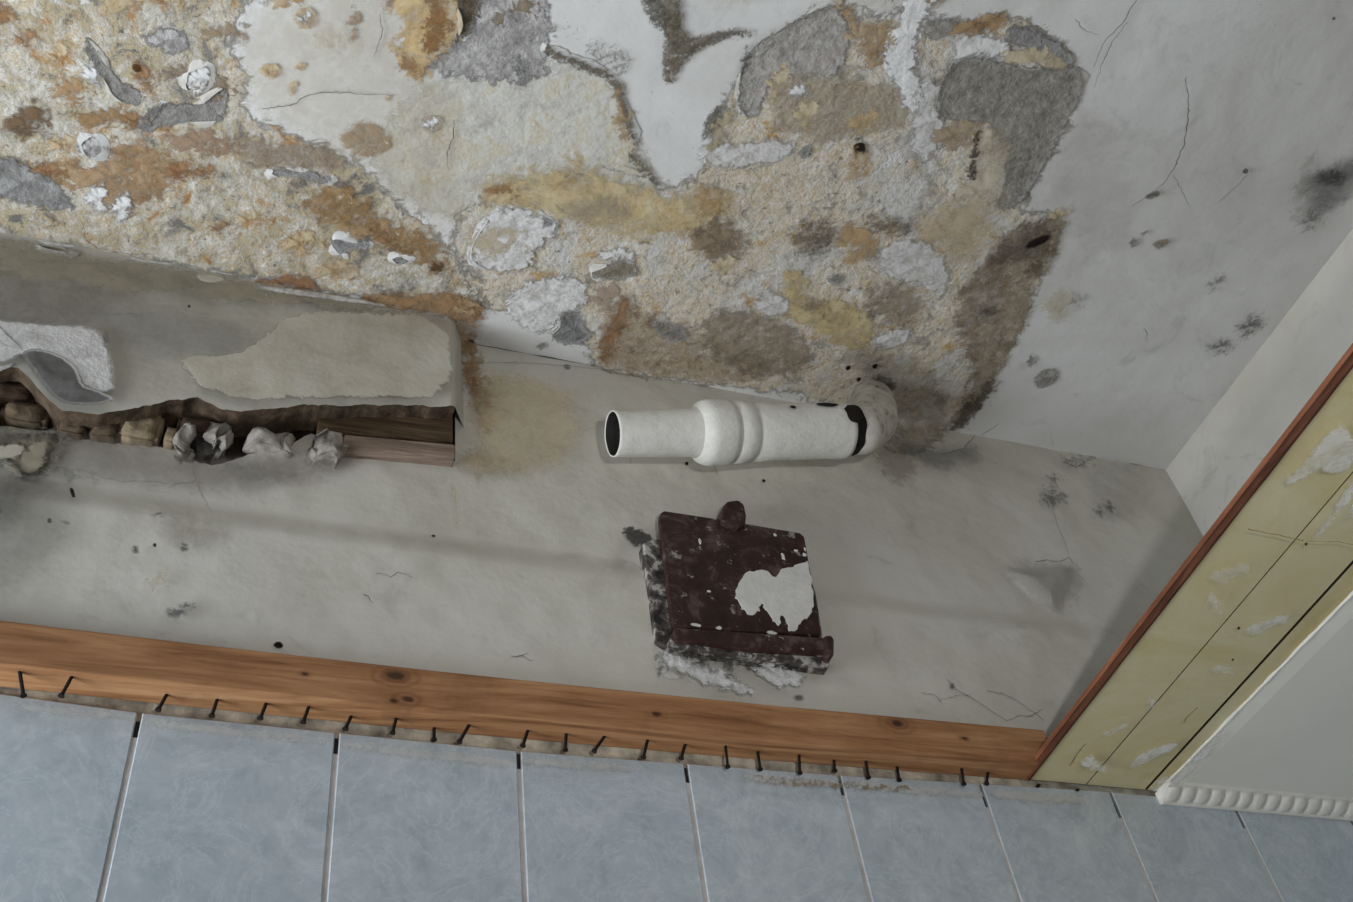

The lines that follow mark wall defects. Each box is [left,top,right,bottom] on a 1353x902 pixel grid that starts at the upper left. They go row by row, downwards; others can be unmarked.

crack [1075,0,1137,88]
peeling [0,0,1089,455]
crack [1134,77,1190,205]
leakage [1311,163,1353,208]